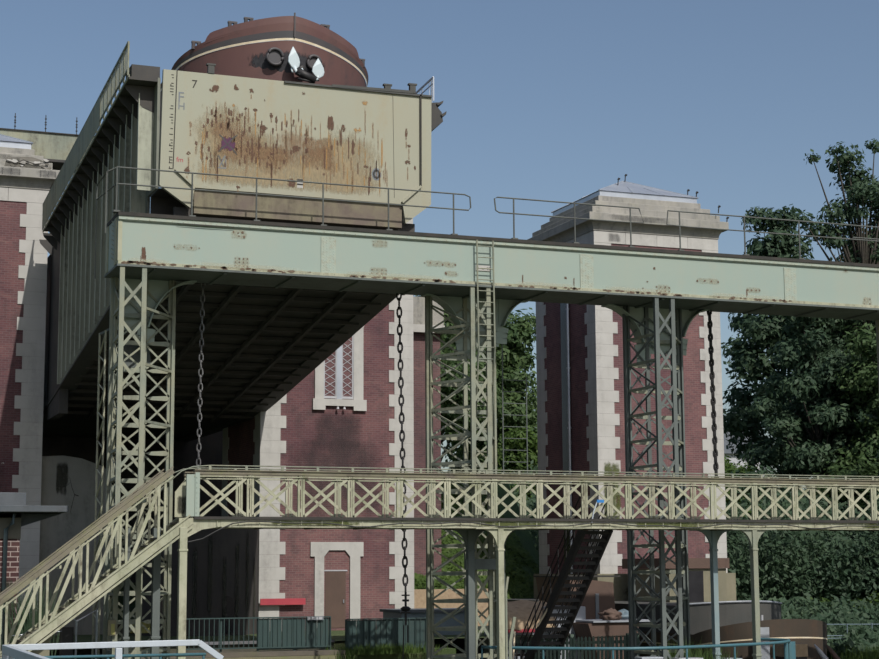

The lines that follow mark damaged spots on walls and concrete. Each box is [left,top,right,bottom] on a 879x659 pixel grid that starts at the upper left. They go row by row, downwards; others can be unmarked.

corrosion [184,84,388,195]